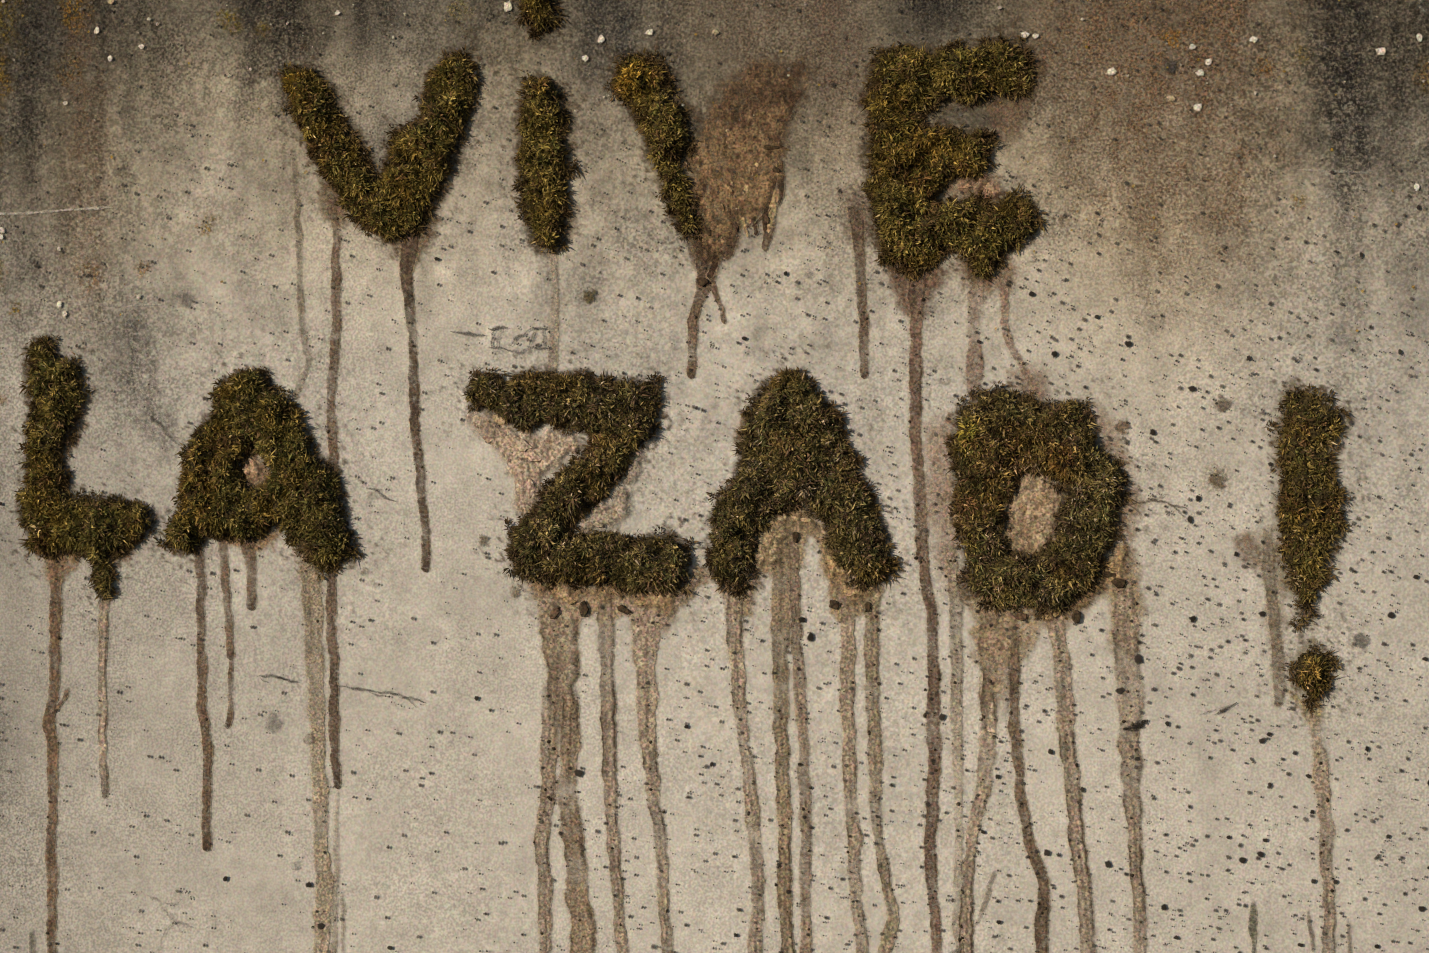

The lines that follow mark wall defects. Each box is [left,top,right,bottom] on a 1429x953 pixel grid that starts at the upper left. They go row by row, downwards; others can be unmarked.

leakage [326,198,344,468]
leakage [399,220,431,572]
leakage [29,554,69,953]
leakage [194,537,257,852]
leakage [300,562,345,953]
leakage [533,575,701,953]
leakage [725,531,813,953]
leakage [835,575,899,953]
leakage [903,264,1050,953]
leakage [1045,614,1096,953]
leakage [1111,543,1147,953]
leakage [1302,700,1351,953]